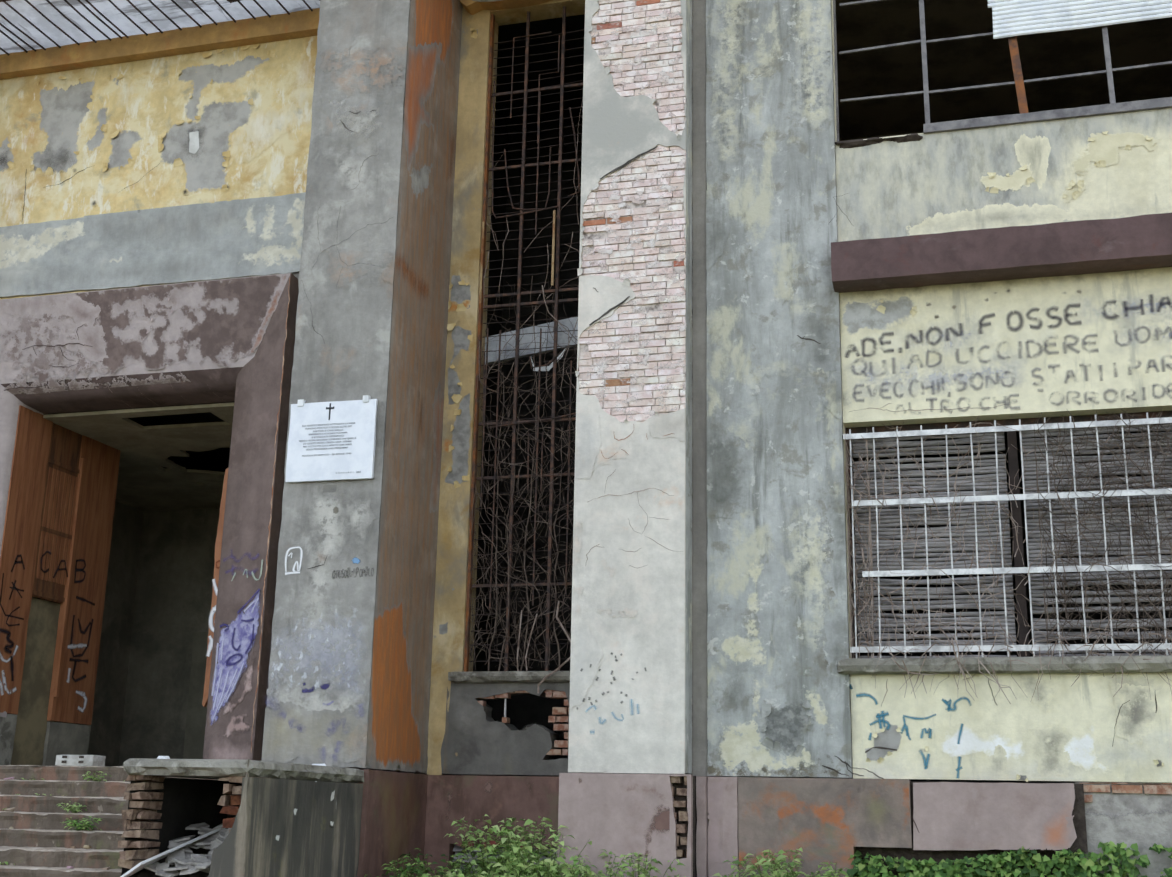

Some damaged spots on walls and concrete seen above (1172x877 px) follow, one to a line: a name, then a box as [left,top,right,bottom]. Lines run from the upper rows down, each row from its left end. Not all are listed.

peeling [0,74,144,270]
peeling [55,197,305,375]
peeling [158,44,317,196]
spalling [575,0,686,424]
damp [706,190,730,270]
rust [367,0,471,773]
damp [649,412,685,442]
damp [707,416,756,520]
spalling [478,690,569,756]
damp [707,482,1172,834]
spalling [124,777,242,854]
rust [775,800,851,834]